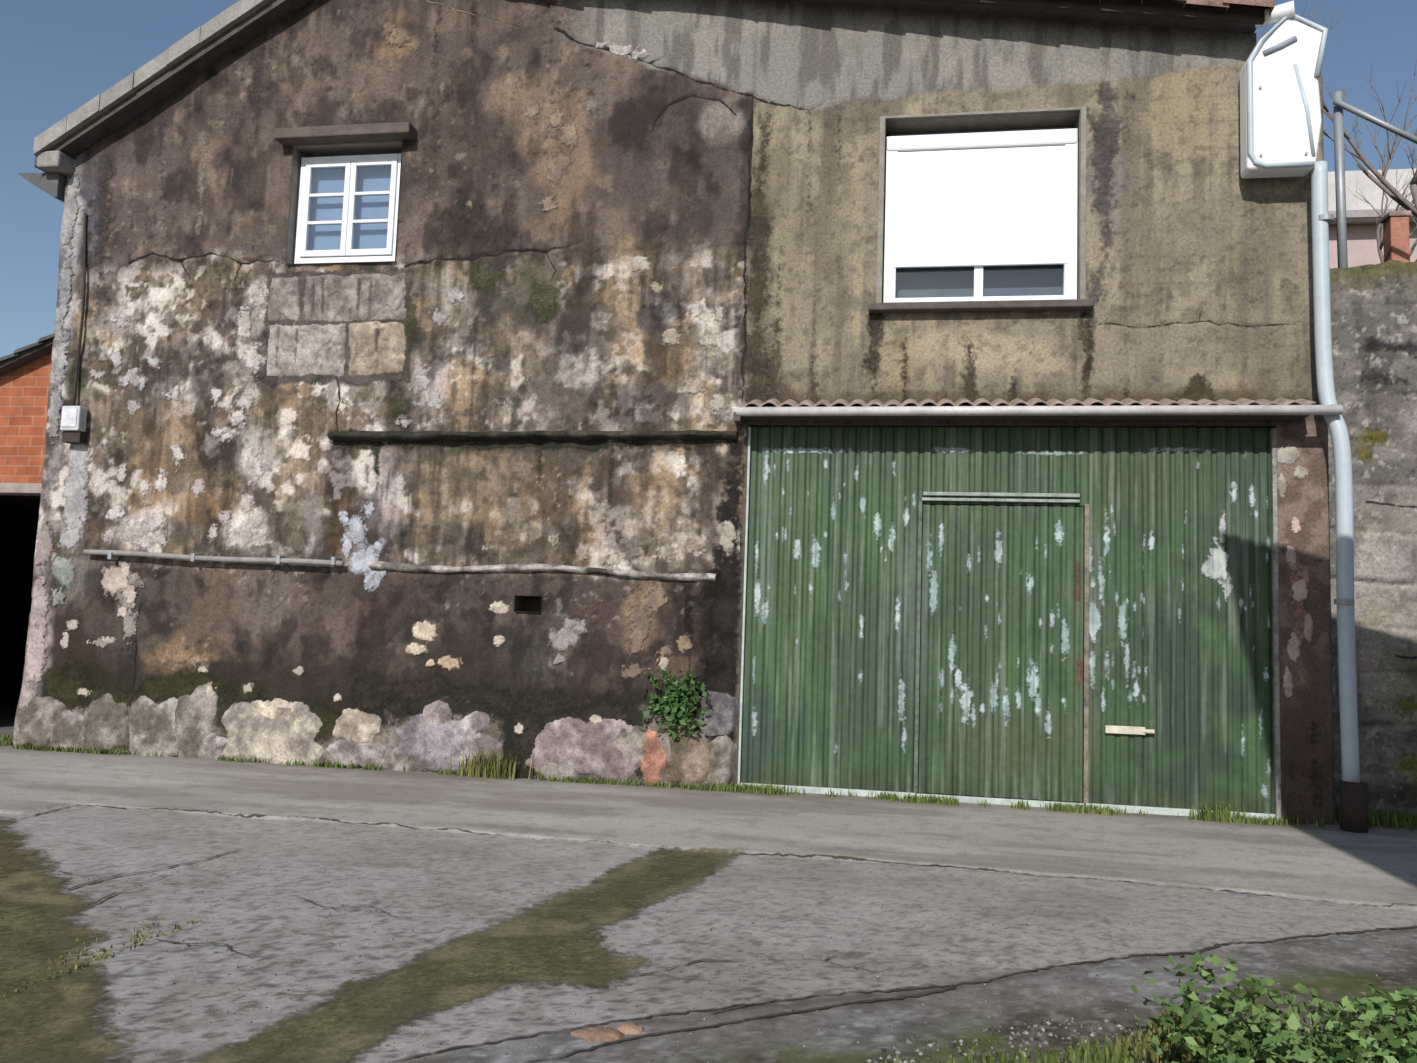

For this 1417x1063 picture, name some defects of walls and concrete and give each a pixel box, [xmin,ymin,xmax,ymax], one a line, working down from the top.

crack [554,27,823,402]
water stain [1072,82,1155,406]
water stain [862,313,885,406]
water stain [895,344,1020,406]
water stain [1171,375,1214,405]
water stain [1366,336,1417,355]
spalling [13,160,757,788]
peeling [776,470,859,568]
peeling [860,494,916,561]
peeling [1201,445,1308,612]
peeling [1089,505,1147,711]
peeling [939,637,1066,738]